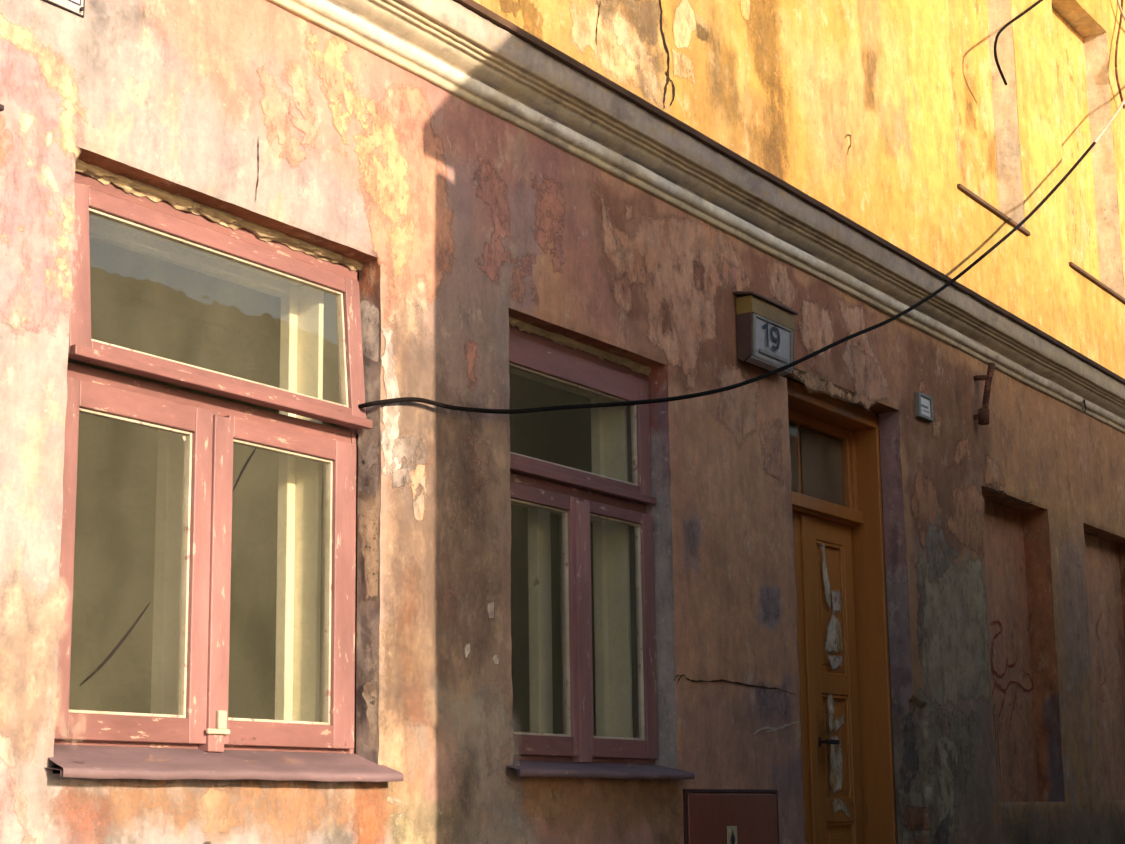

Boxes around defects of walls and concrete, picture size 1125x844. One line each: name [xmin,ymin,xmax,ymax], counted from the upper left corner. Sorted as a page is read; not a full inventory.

flaking render [569,0,709,107]
crack [659,0,675,108]
peeling [740,0,750,20]
leakage [747,0,788,179]
peeling [0,13,85,332]
peeling [258,31,455,599]
peeling [601,197,750,391]
peeling [717,365,783,479]
peeling [911,456,1005,560]
peeling [362,680,377,742]
crack [673,674,794,694]
flaking render [0,734,40,844]